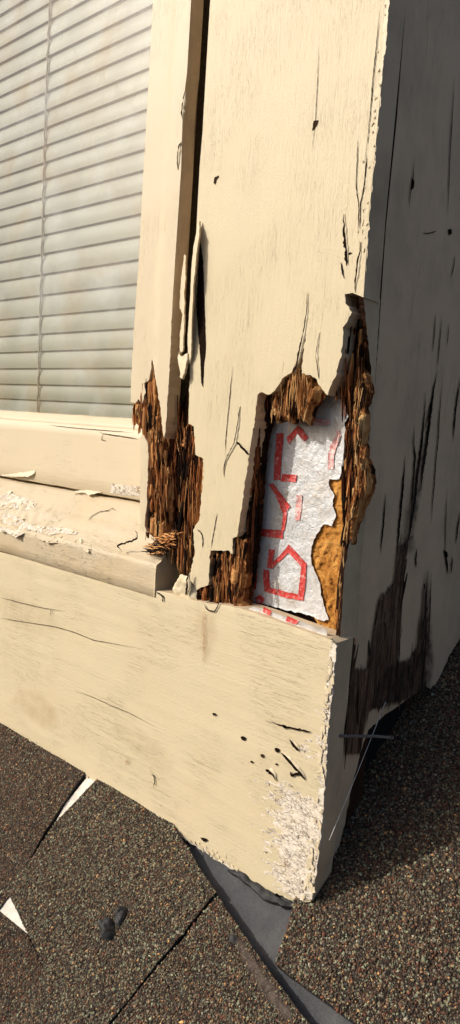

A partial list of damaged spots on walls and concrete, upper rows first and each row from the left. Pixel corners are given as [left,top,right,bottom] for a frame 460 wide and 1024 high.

crack [340,5,381,293]
peeling [178,221,201,379]
crack [223,369,249,475]
peeling [0,491,91,553]
crack [266,721,311,781]
peeling [247,638,338,901]